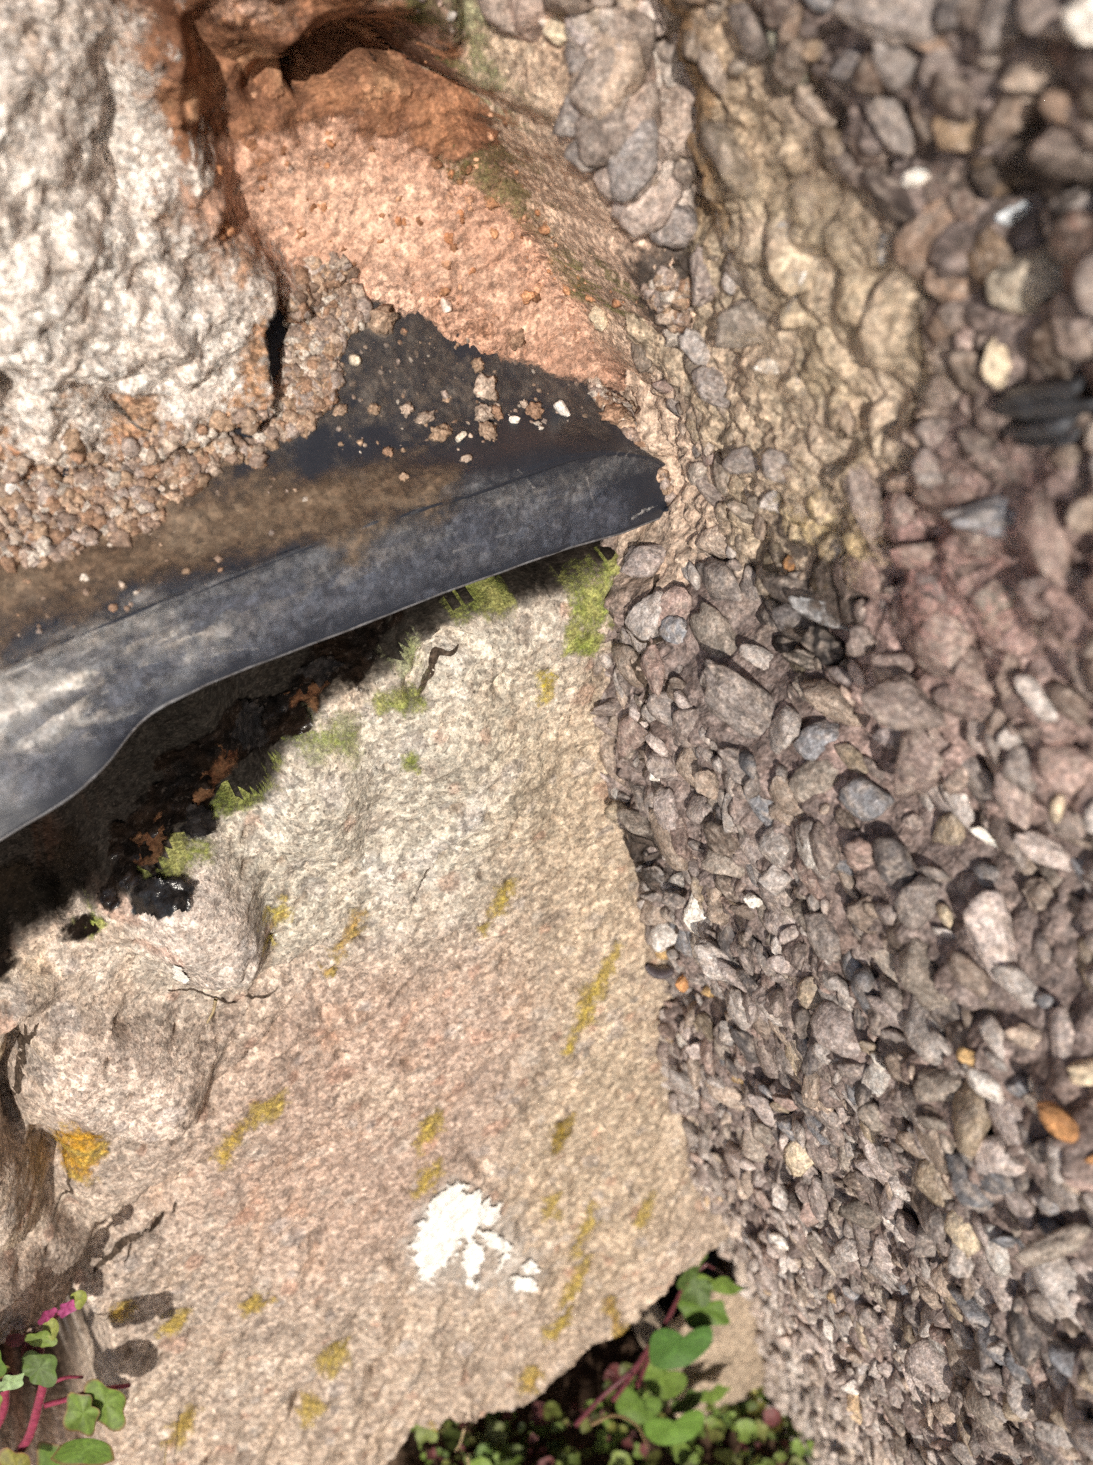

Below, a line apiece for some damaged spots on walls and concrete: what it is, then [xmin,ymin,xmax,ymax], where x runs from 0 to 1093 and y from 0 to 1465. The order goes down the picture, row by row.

rust [154,116,623,391]
crack [93,1202,177,1274]